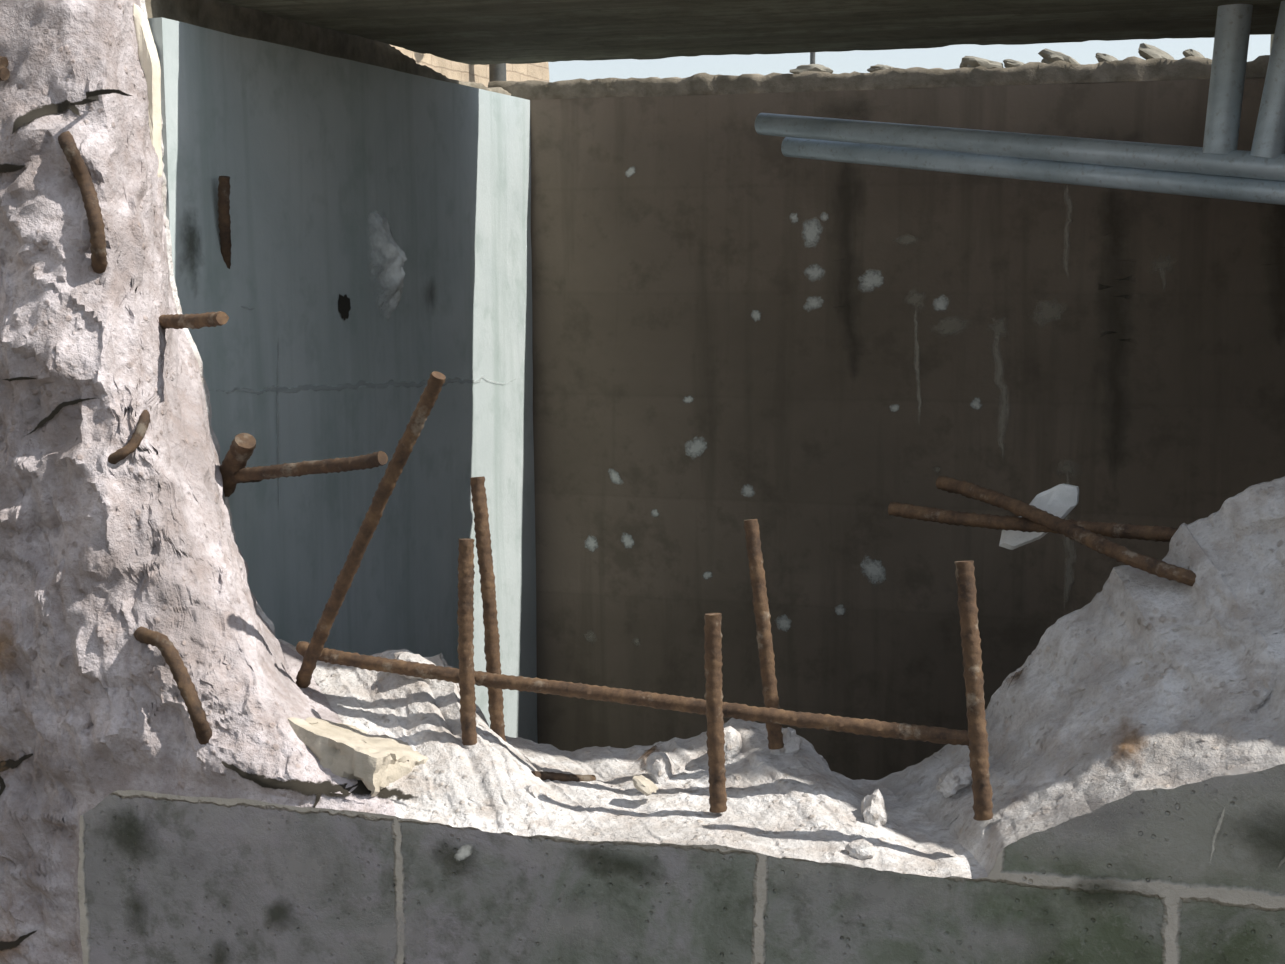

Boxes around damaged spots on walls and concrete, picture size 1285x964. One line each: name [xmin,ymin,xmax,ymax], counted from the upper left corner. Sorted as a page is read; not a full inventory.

spalling [0,0,446,964]
spalling [312,476,1285,879]